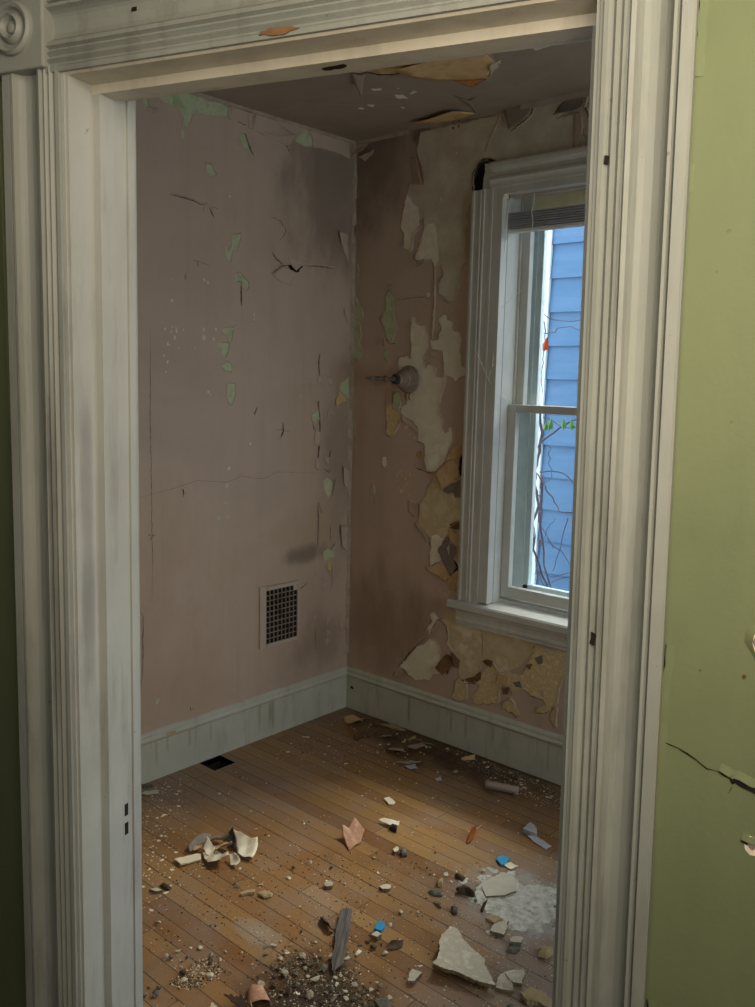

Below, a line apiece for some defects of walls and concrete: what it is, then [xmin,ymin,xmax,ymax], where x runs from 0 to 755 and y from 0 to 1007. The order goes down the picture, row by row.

peeling [322,64,398,109]
crack [695,0,709,76]
crack [688,165,696,193]
peeling [236,120,374,654]
flaking render [388,96,589,567]
flaking render [390,611,567,728]
crack [655,644,755,834]
flaking render [741,832,755,856]